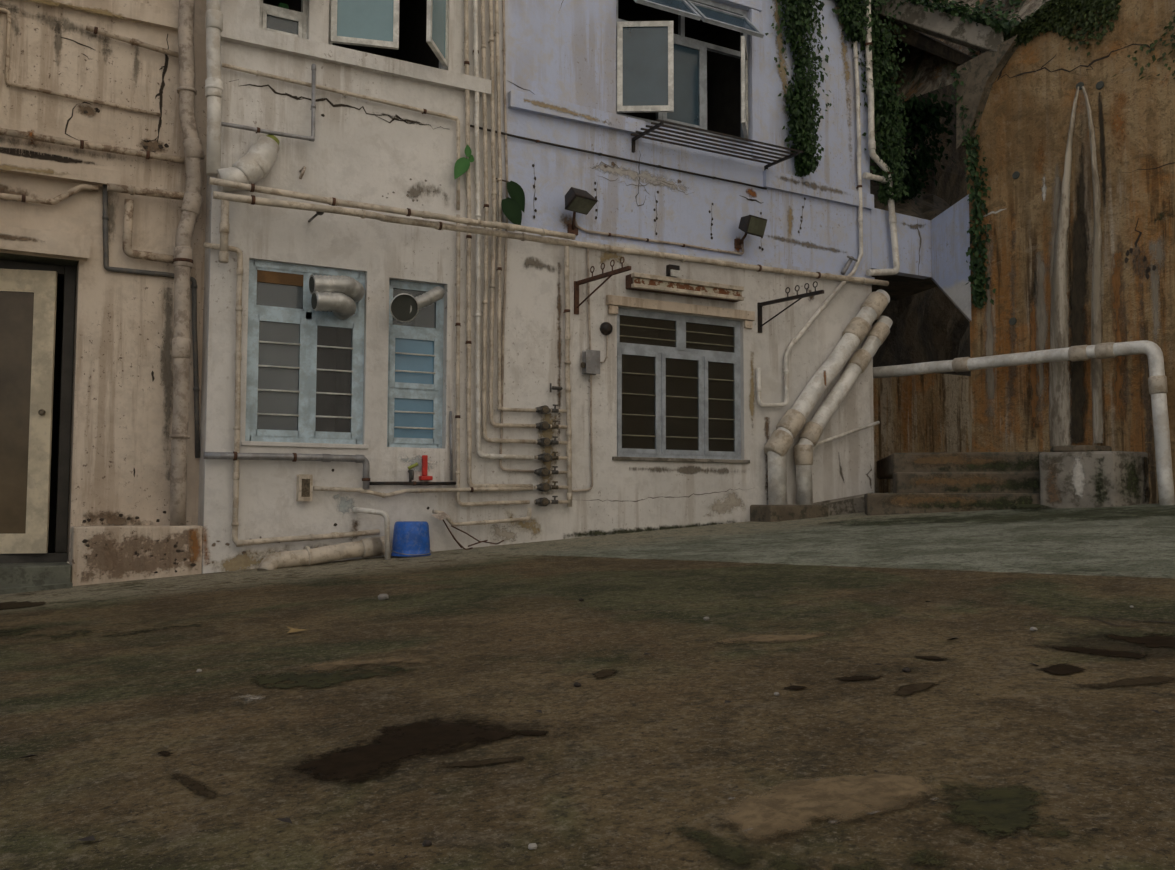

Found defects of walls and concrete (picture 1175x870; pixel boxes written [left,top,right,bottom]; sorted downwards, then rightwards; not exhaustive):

crack [980,39,1171,82]
crack [141,34,169,142]
peeling [590,162,687,195]
spalling [82,530,196,581]